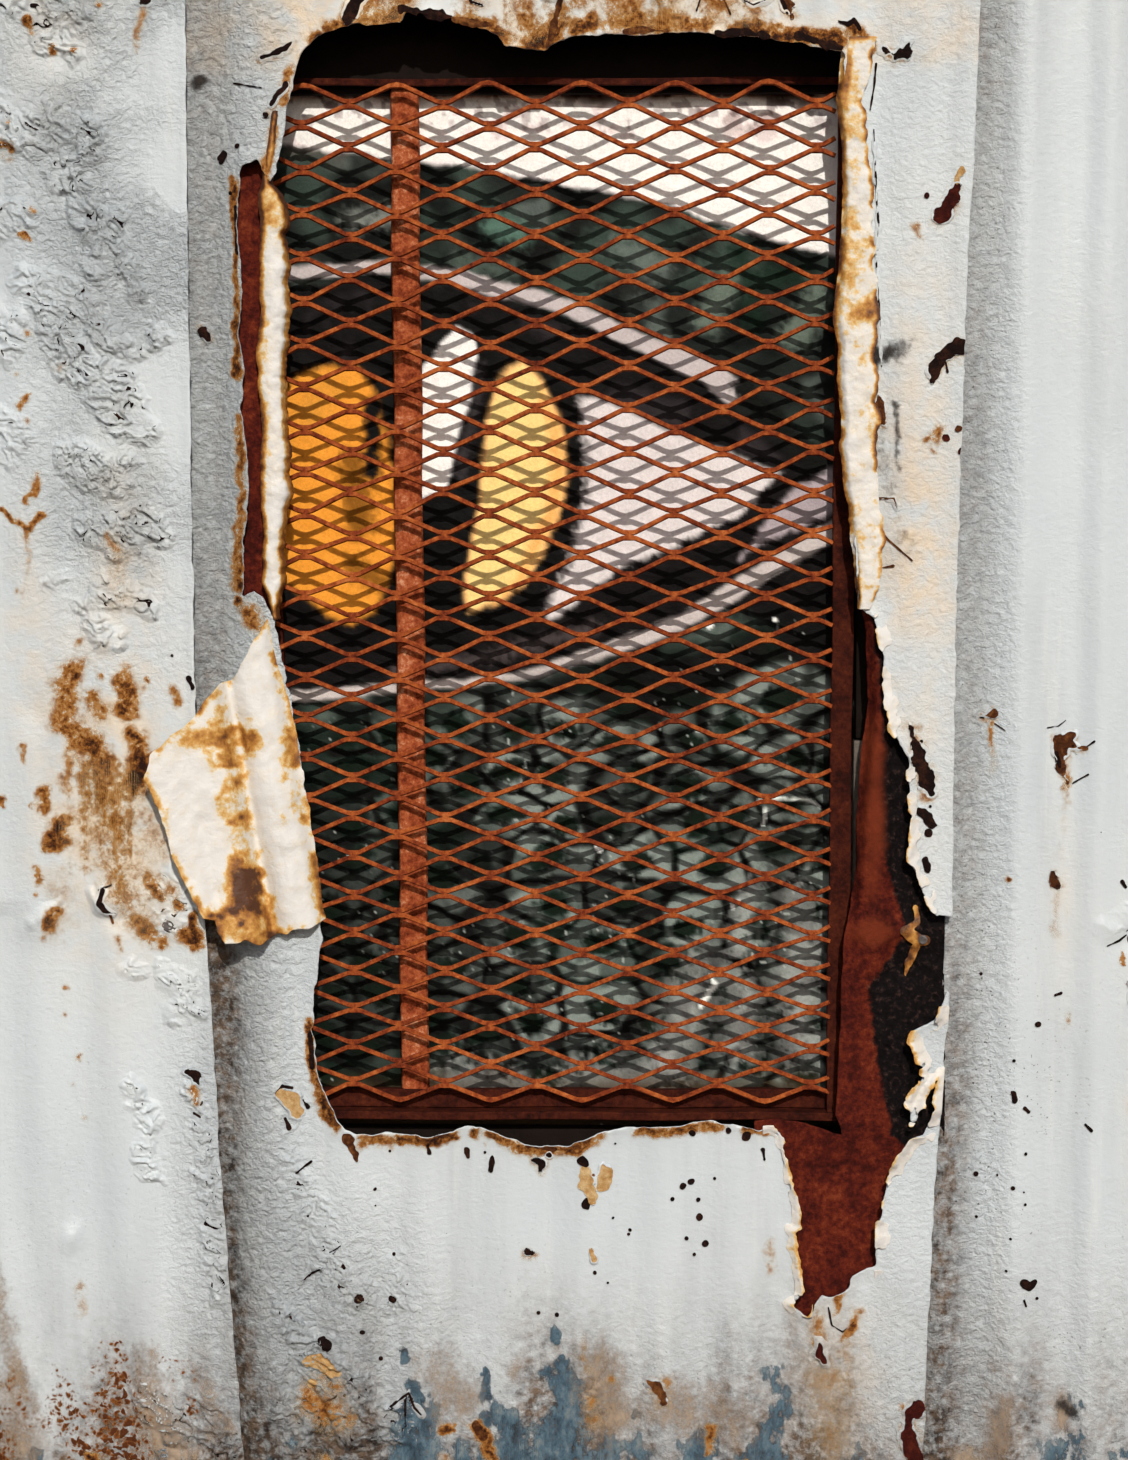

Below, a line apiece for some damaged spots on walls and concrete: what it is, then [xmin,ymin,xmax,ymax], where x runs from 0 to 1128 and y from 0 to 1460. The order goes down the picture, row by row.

corrosion [308,0,877,54]
peeling [233,37,298,181]
peeling [912,166,966,237]
peeling [924,337,965,384]
corrosion [29,638,205,952]
peeling [907,722,939,837]
corrosion [900,905,930,976]
peeling [577,1156,613,1210]
peeling [670,1179,703,1221]
corrosion [0,1341,153,1460]
leakage [581,1350,749,1436]
leakage [1056,1395,1077,1429]